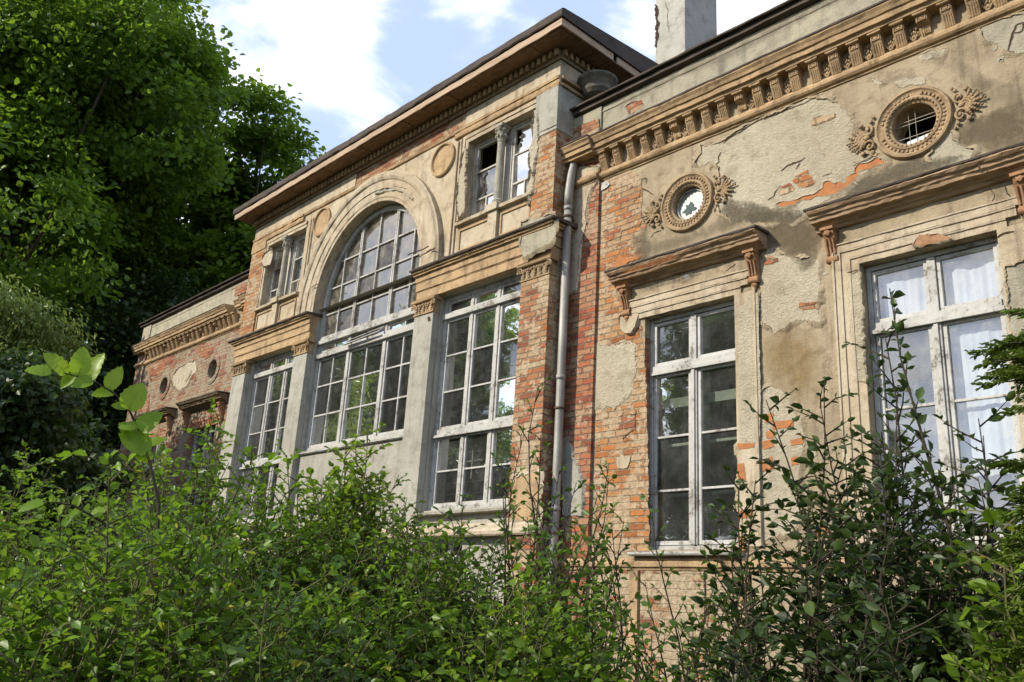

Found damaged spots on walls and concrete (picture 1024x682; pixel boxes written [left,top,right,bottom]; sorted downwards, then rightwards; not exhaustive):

spalling [975,10,1024,62]
spalling [518,110,559,261]
water stain [717,199,818,265]
spalling [691,92,893,229]
spalling [912,233,952,248]
spalling [146,343,213,392]
flaking render [562,156,651,555]
spalling [733,245,832,558]